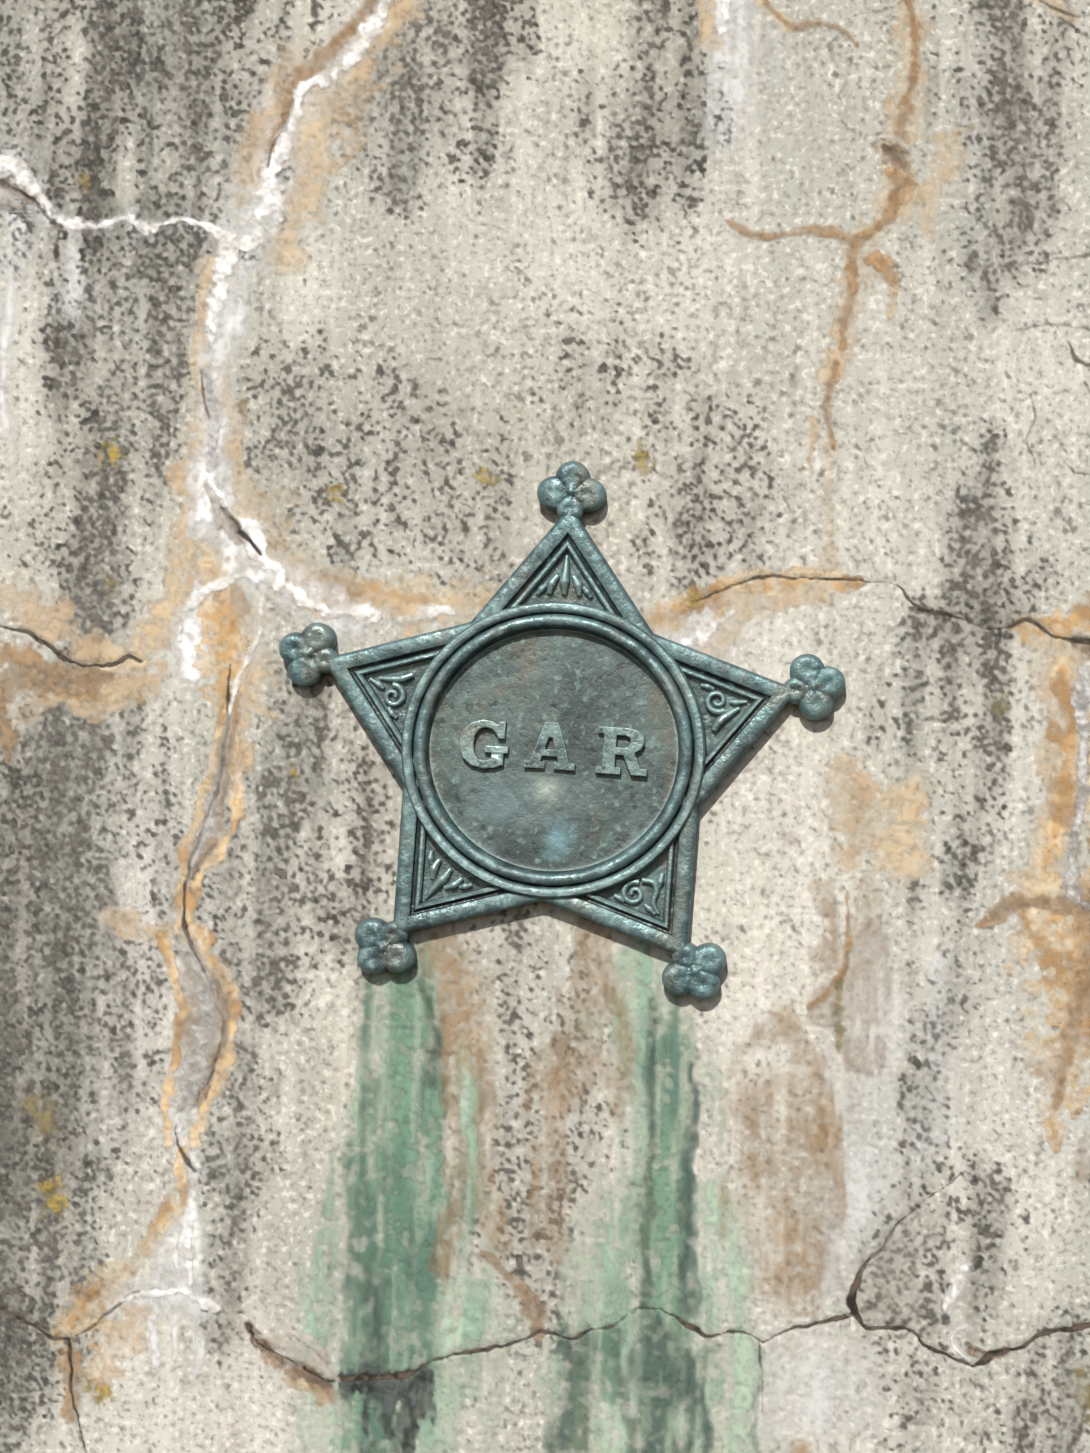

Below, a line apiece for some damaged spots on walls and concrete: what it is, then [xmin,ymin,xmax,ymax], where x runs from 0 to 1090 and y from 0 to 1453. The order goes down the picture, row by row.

rust [246,0,418,272]
rust [805,154,955,403]
water stain [935,0,1084,321]
crack [0,625,143,667]
rust [0,256,276,1234]
crack [220,505,262,555]
water stain [0,0,780,1453]
crack [695,573,1090,644]
water stain [837,421,1058,932]
rust [975,605,1090,1153]
crack [245,1171,1090,1382]
water stain [848,951,1011,1357]